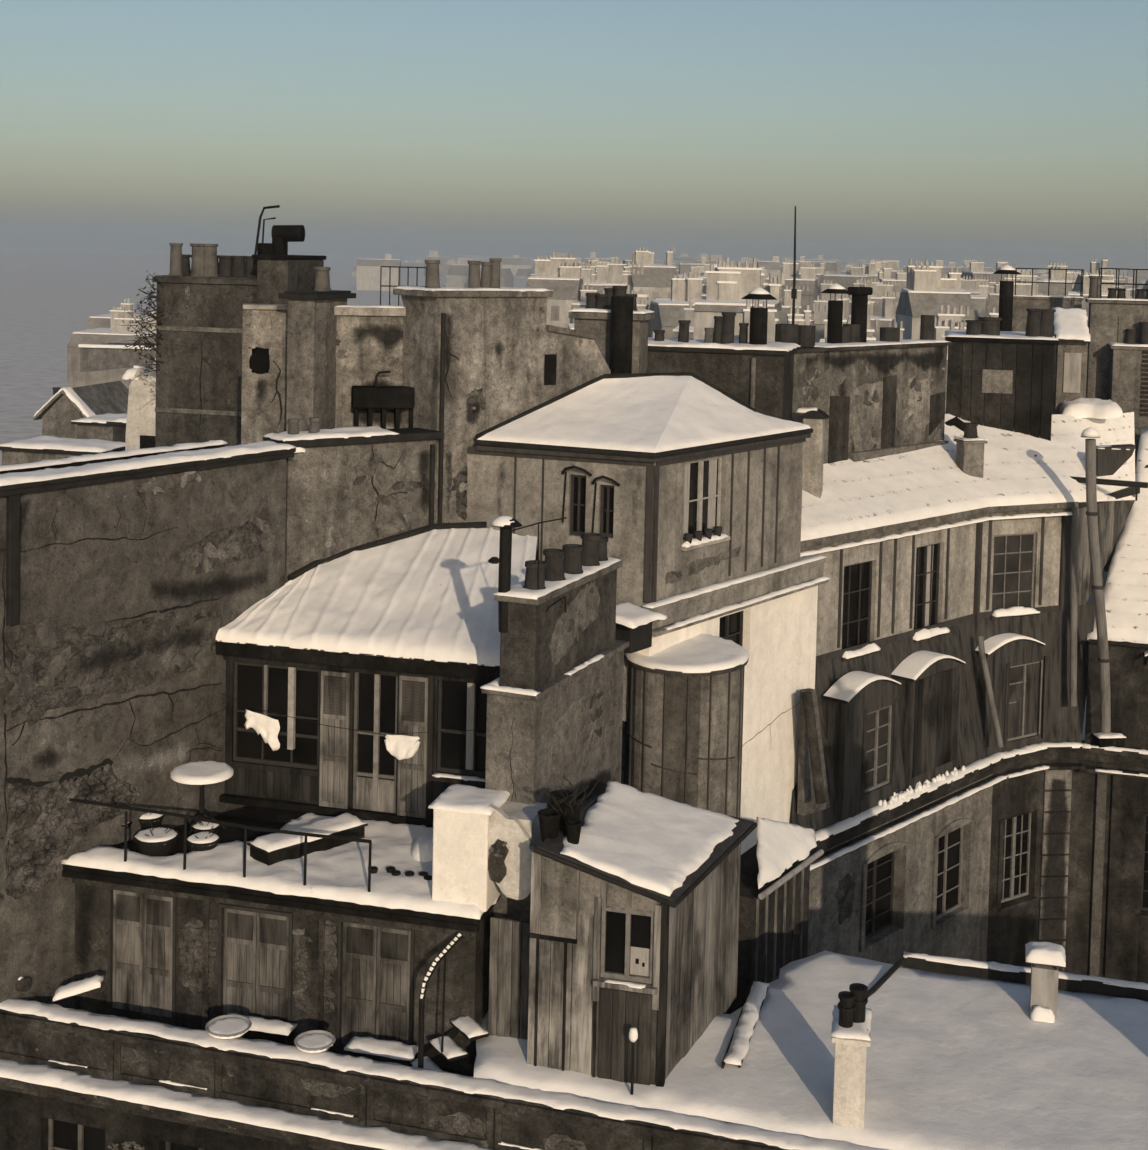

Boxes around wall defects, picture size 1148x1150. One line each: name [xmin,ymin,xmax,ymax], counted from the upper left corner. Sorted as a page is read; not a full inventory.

leakage [356,326,403,349]
crack [271,360,283,427]
crack [371,444,408,538]
crack [0,492,178,669]
crack [106,596,223,623]
crack [4,683,223,868]
peeling [107,1140,152,1150]